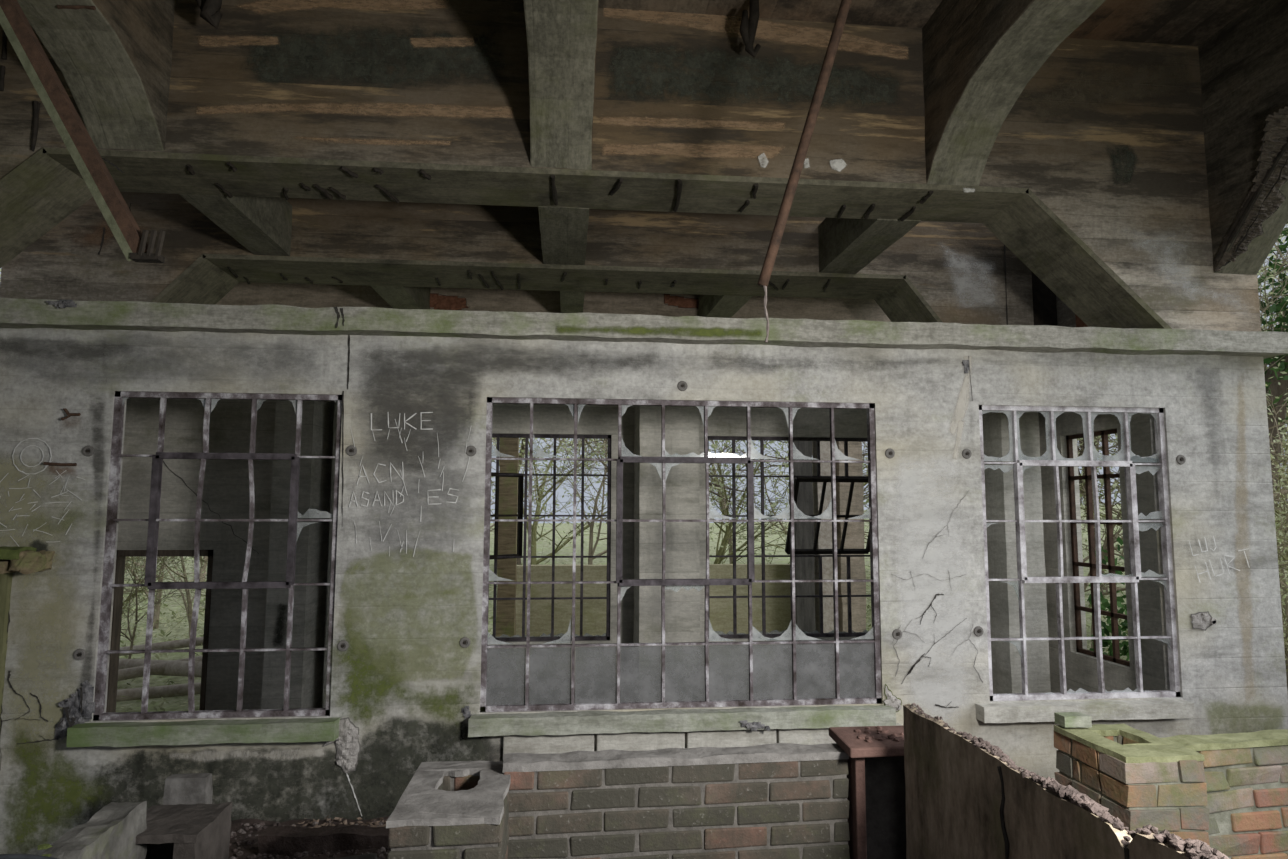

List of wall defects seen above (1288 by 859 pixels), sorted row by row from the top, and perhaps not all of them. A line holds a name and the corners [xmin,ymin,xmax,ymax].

spalling [1214,106,1288,272]
damp [371,351,564,466]
crack [891,495,983,684]
crack [0,597,83,770]